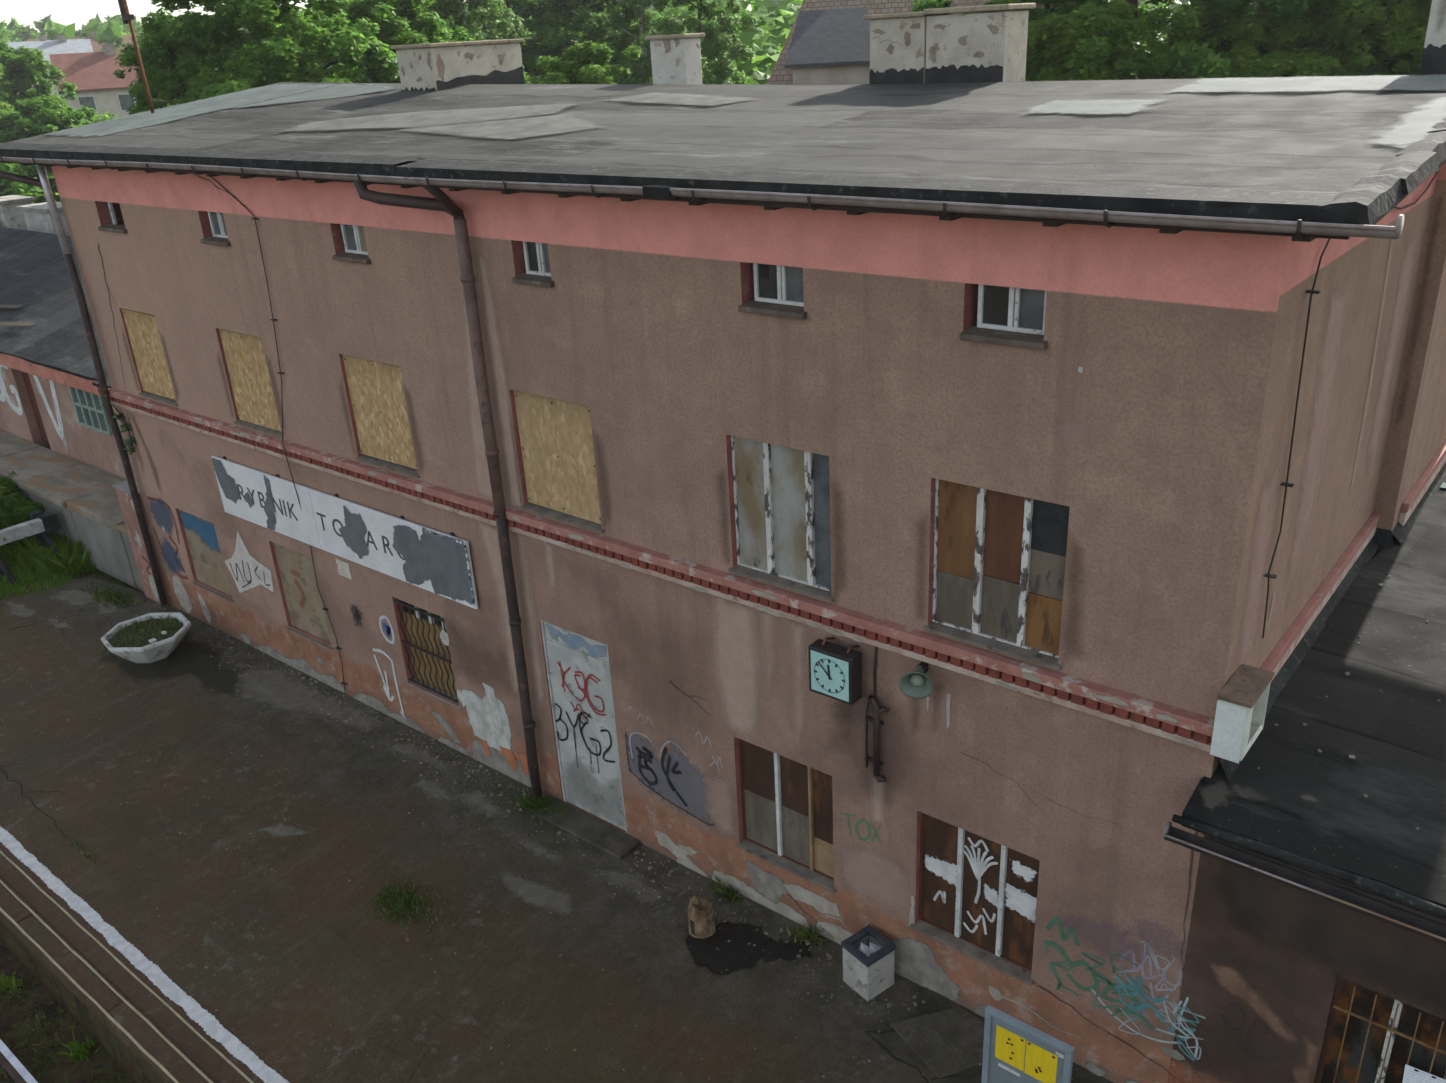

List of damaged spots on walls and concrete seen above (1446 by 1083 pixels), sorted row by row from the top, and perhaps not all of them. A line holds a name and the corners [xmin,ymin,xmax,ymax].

flaking render [872,23,946,54]
flaking render [958,35,985,59]
flaking render [401,52,446,82]
peeling [440,629,449,646]
peeling [240,633,531,788]
spalling [503,874,572,914]
peeling [654,830,853,975]